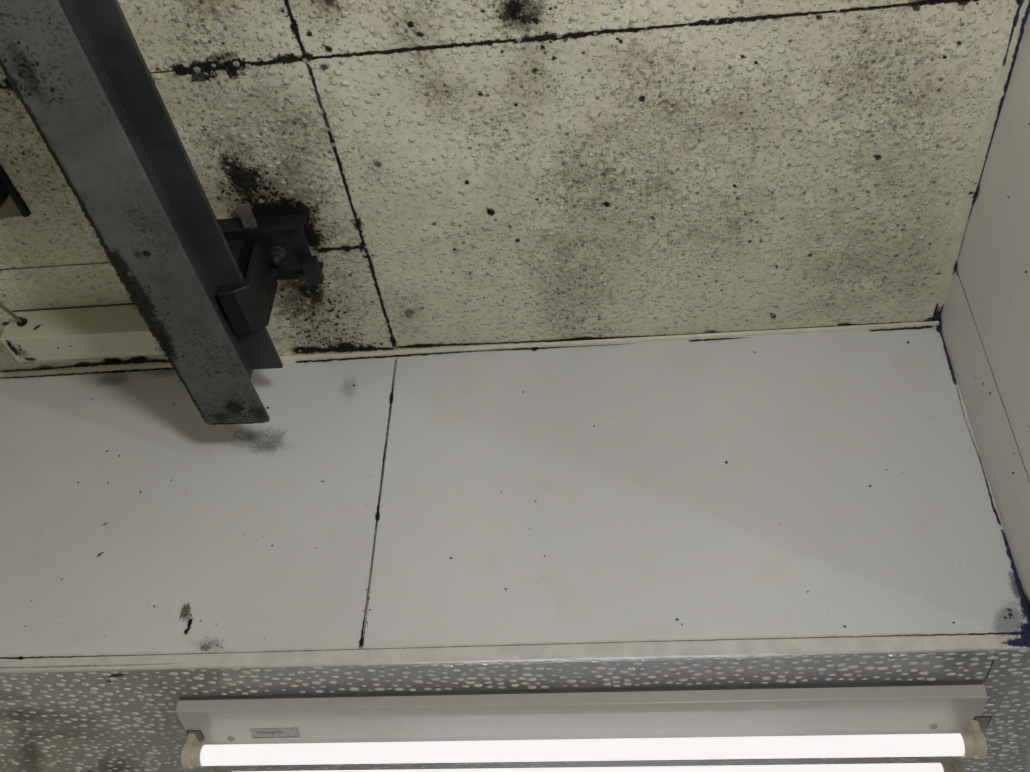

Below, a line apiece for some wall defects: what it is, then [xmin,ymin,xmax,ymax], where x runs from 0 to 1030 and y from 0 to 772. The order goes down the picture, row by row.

water stain [0,36,269,445]
water stain [770,442,1030,647]